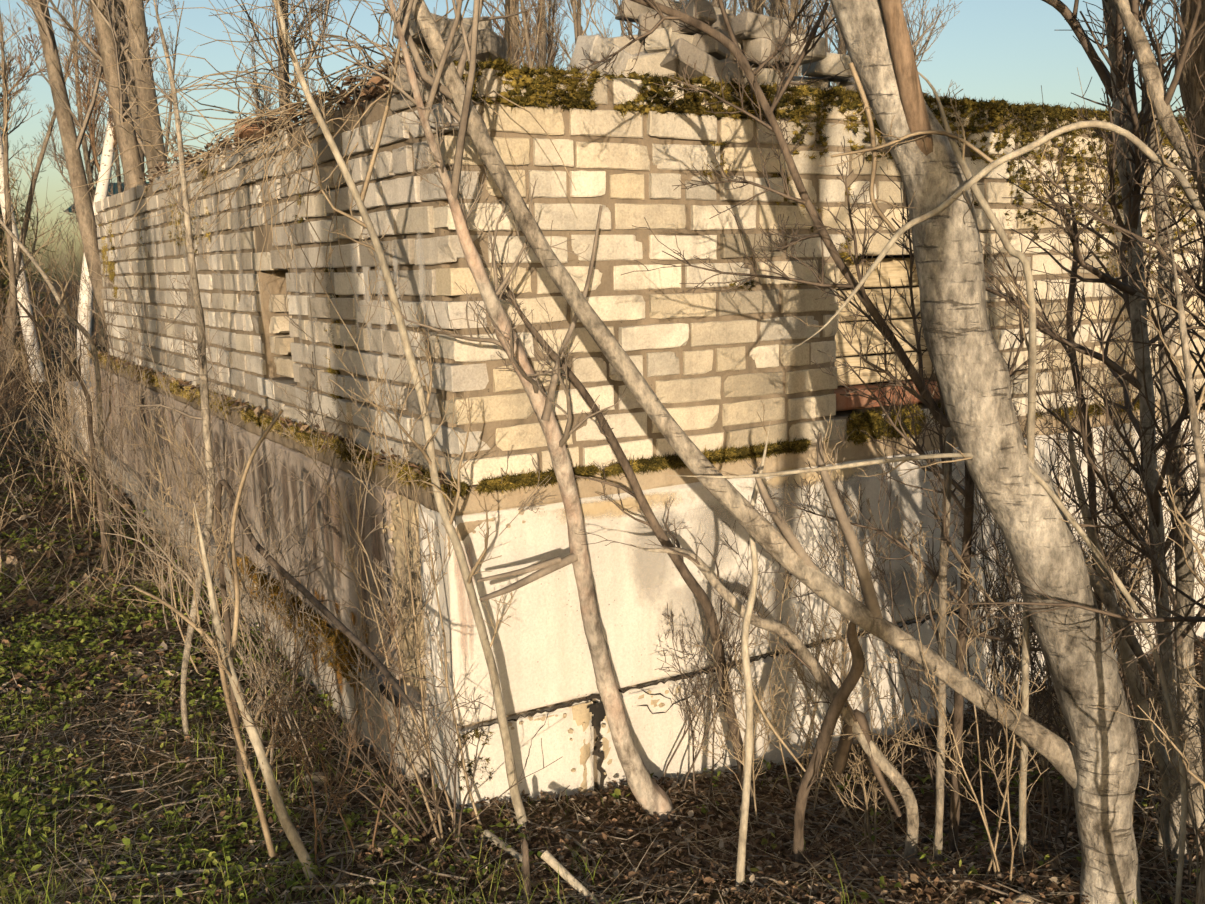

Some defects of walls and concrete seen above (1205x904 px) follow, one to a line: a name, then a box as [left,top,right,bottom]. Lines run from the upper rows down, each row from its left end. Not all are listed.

damp [101,378,381,607]
spalling [508,699,612,794]